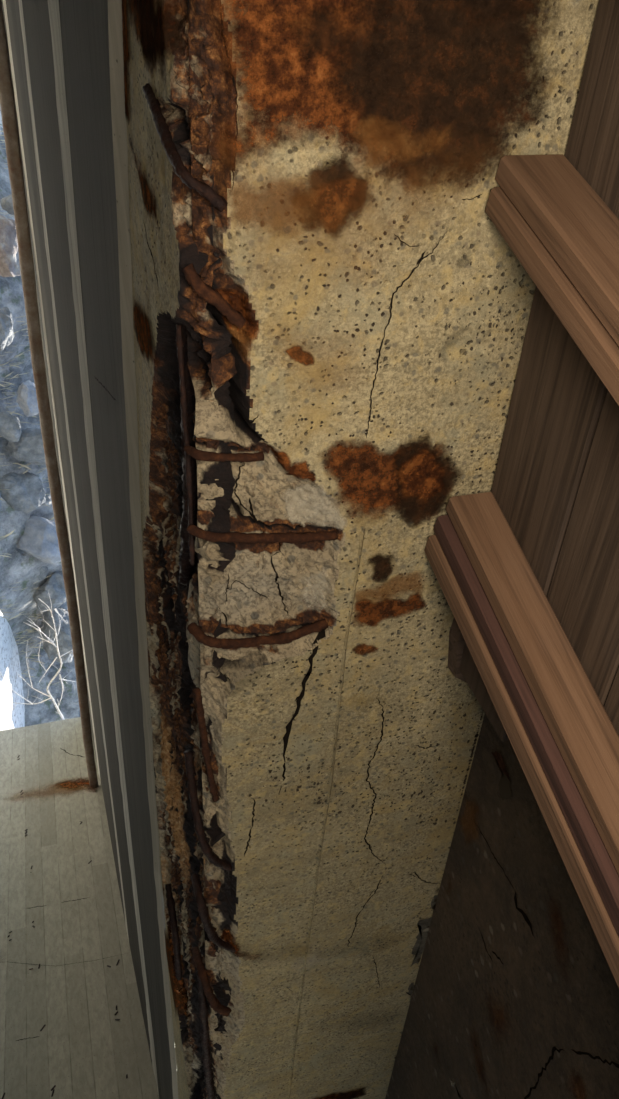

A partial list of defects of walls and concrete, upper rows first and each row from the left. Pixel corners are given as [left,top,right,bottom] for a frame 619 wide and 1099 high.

corrosion [122,0,186,123]
corrosion [212,0,551,236]
corrosion [129,138,158,225]
corrosion [133,302,157,364]
corrosion [286,346,314,366]
crack [366,233,446,438]
corrosion [268,436,462,527]
spalling [142,0,360,1099]
corrosion [354,554,426,626]
crack [244,629,326,857]
crack [348,689,440,987]
crack [524,1046,619,1099]